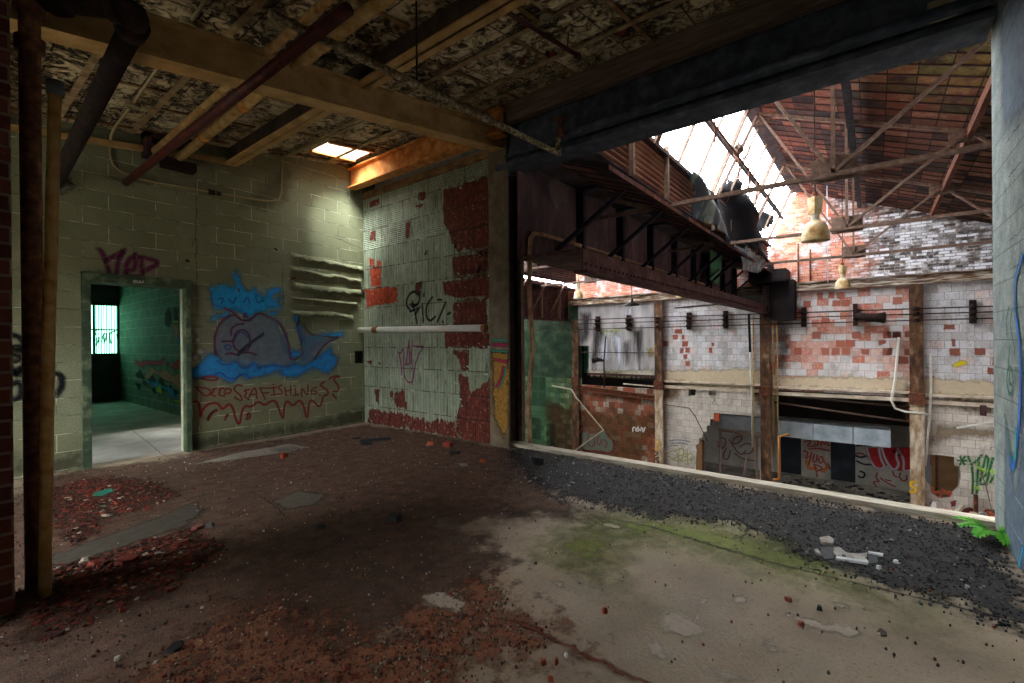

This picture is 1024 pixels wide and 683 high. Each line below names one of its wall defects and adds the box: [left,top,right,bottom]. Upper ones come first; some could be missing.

rust [309,140,375,162]
peeling [364,176,490,444]
peeling [803,292,850,307]
peeling [663,329,690,366]
leakage [581,312,908,391]
peeling [812,318,909,364]